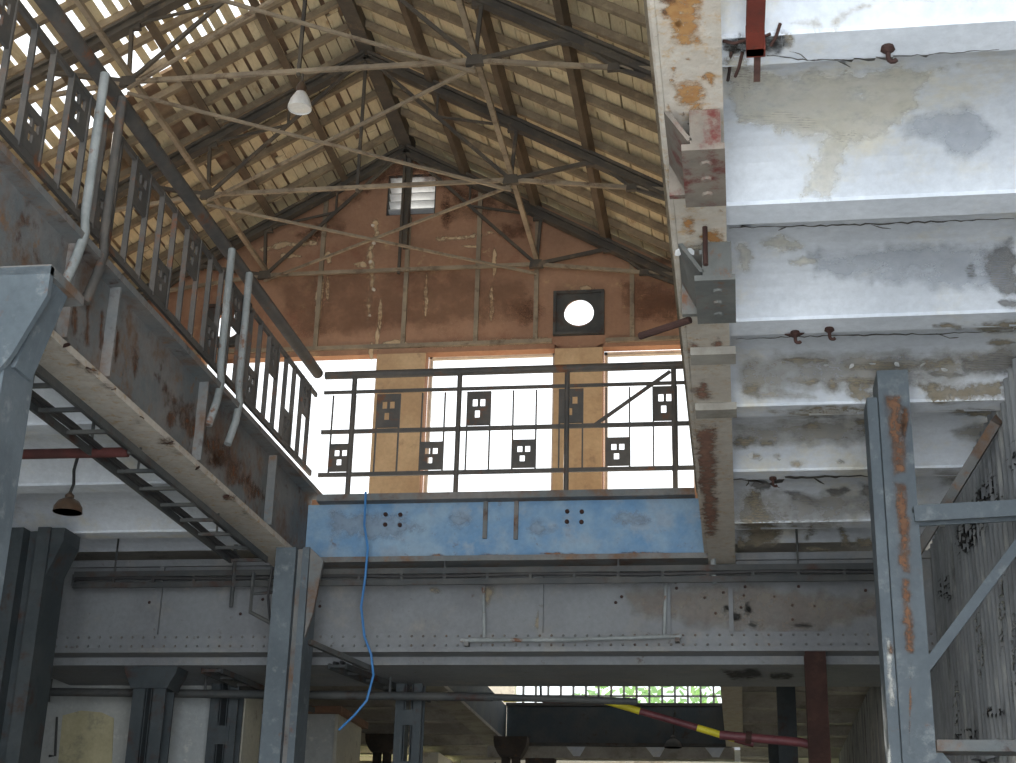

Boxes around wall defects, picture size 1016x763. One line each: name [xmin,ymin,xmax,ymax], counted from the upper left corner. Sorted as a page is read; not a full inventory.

corrosion [661,0,702,45]
spalling [722,34,746,82]
spalling [765,23,793,54]
corrosion [668,67,714,124]
corrosion [684,218,723,242]
corrosion [693,383,708,399]
peeling [846,359,954,385]
corrosion [161,386,263,500]
corrosion [886,397,909,472]
corrosion [696,428,719,536]
corrosion [895,484,914,653]